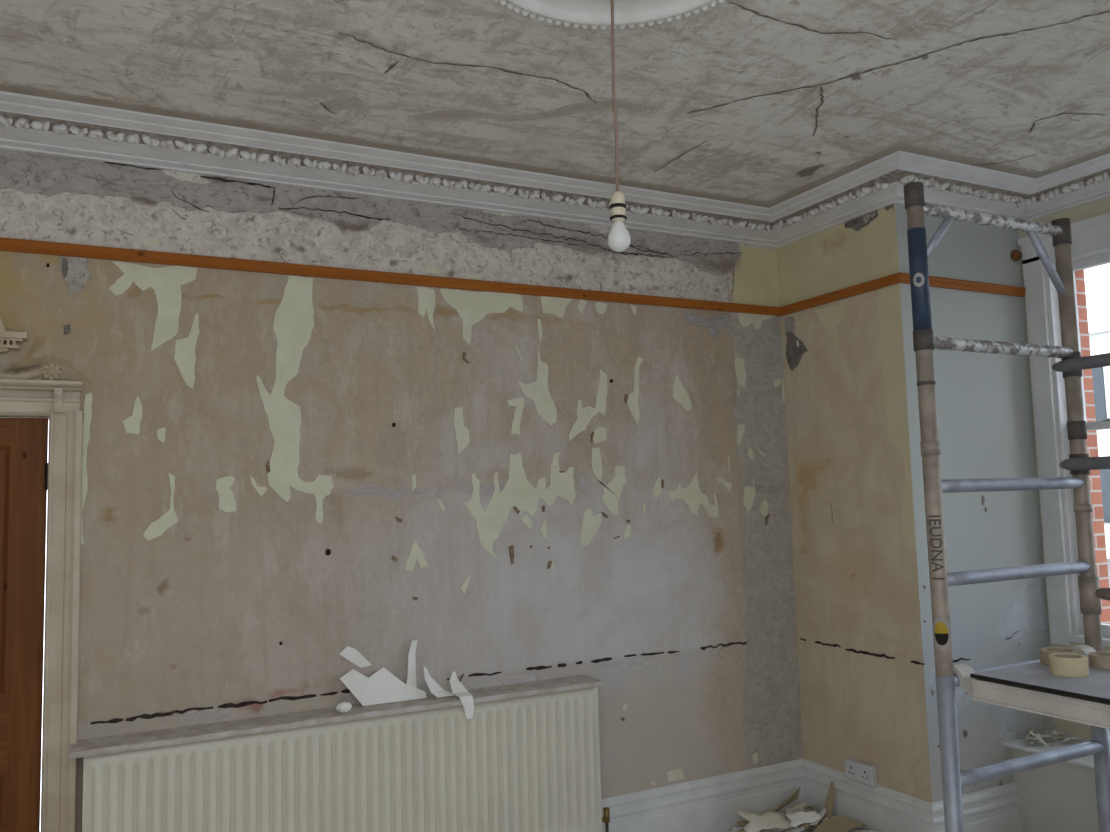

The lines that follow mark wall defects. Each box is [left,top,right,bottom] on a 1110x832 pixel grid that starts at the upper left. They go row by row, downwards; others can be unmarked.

crack [338,32,597,104]
crack [688,2,1110,137]
spalling [0,149,745,294]
peeling [109,261,200,389]
peeling [250,276,334,524]
peeling [416,267,523,345]
peeling [507,296,608,435]
peeling [464,369,770,569]
peeling [877,283,916,552]
crack [91,689,351,724]
crack [447,642,747,682]
crack [800,638,925,665]